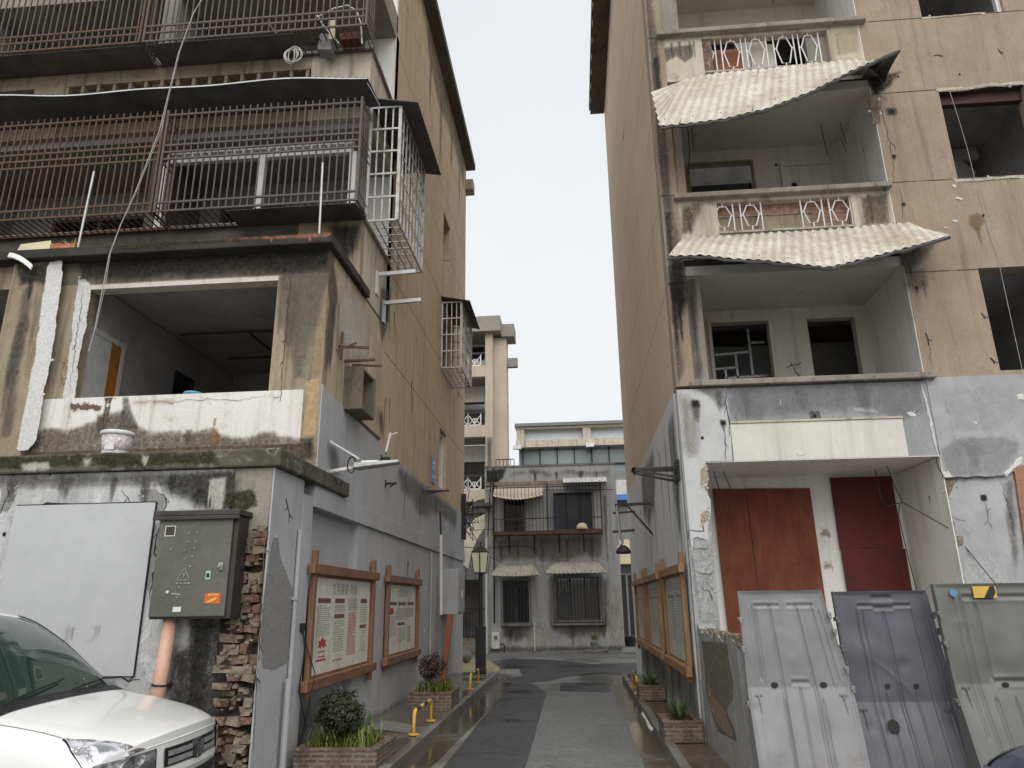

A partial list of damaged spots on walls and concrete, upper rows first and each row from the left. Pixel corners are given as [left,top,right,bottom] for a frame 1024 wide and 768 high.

water stain [654,42,693,89]
water stain [666,204,699,249]
water stain [862,195,889,224]
water stain [3,273,34,435]
crack [146,276,291,404]
water stain [0,398,312,510]
spalling [700,464,709,489]
crack [722,391,730,460]
crack [921,384,1015,563]
spalling [1004,456,1022,476]
spalling [210,526,293,768]
peeling [701,640,736,741]